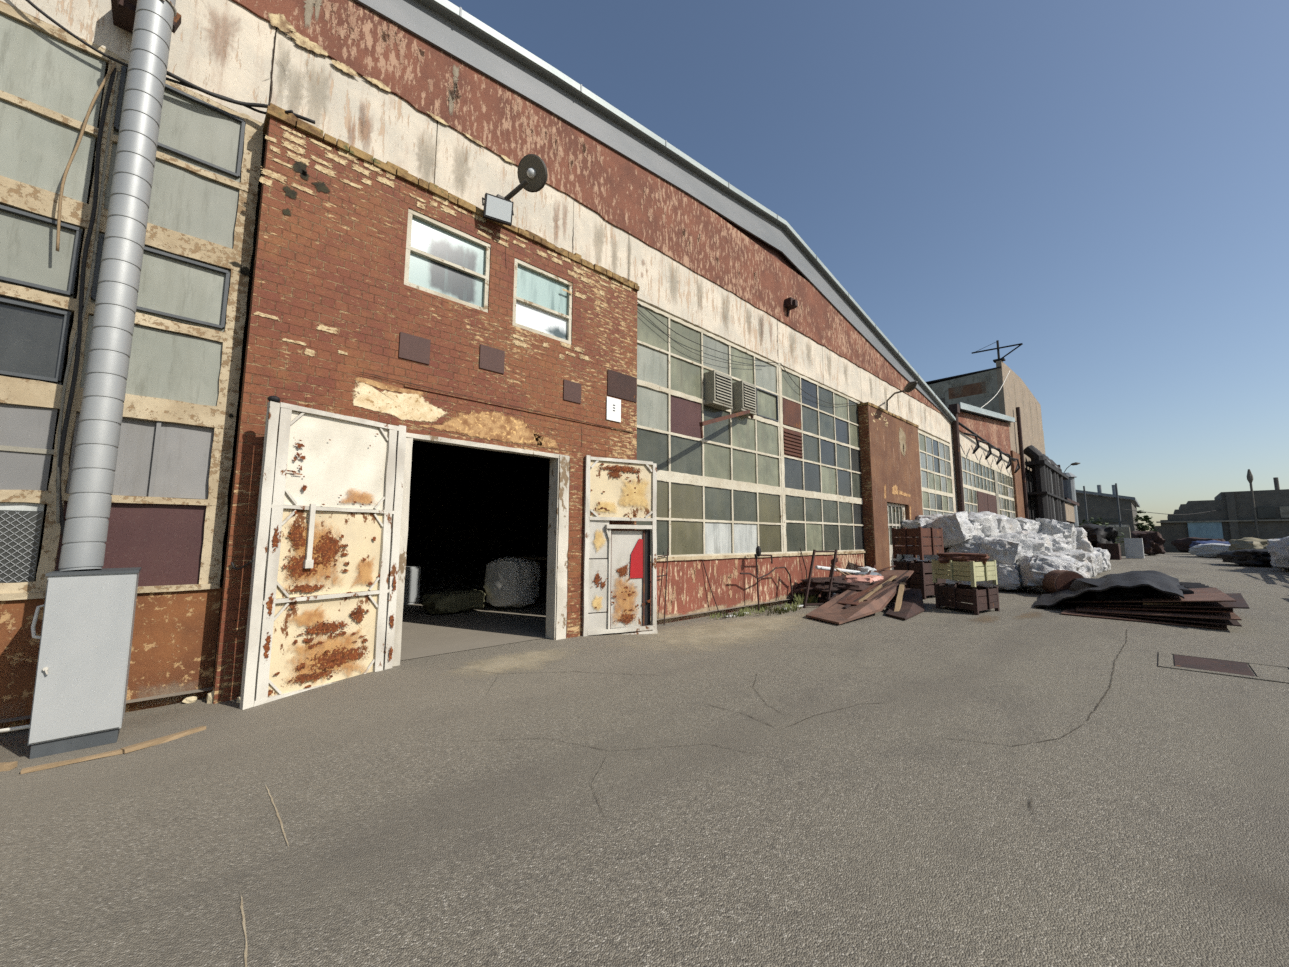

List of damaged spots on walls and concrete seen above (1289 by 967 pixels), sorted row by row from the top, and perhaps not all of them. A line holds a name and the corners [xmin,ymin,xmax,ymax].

peeling [379,20,425,66]
peeling [259,125,395,195]
peeling [506,97,604,175]
peeling [230,261,251,276]
peeling [409,193,632,307]
peeling [542,342,590,373]
flaking render [353,377,559,449]
corrosion [288,440,307,491]
corrosion [590,450,640,515]
corrosion [263,489,397,696]
corrosion [593,564,651,625]
crack [943,631,1127,746]